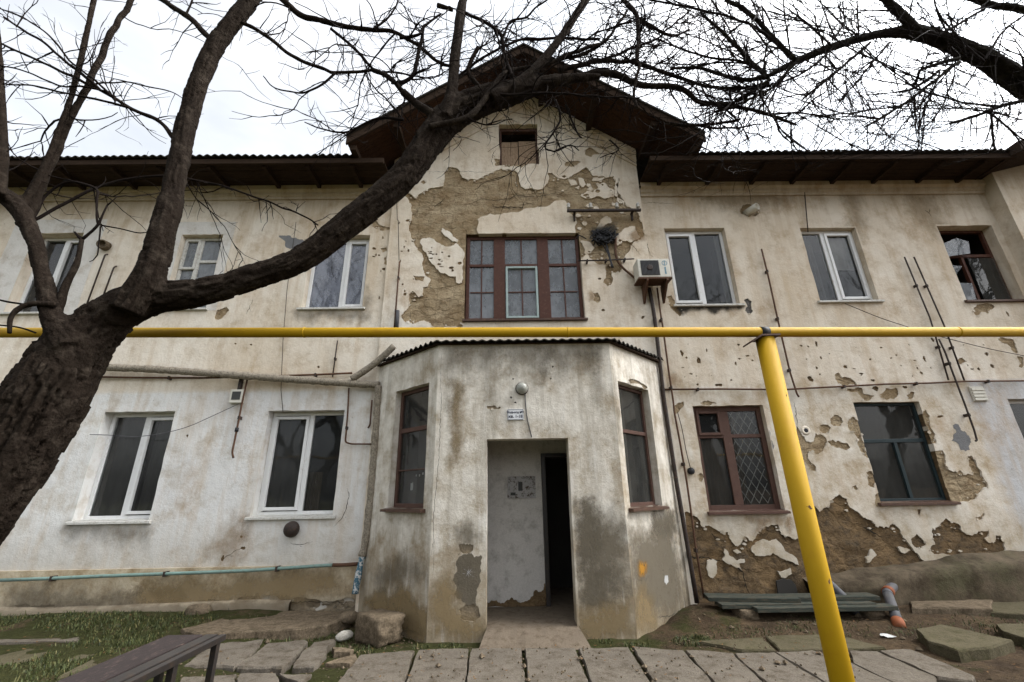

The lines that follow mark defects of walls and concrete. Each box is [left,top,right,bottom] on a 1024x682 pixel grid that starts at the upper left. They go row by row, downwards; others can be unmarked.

peeling [370,148,644,327]